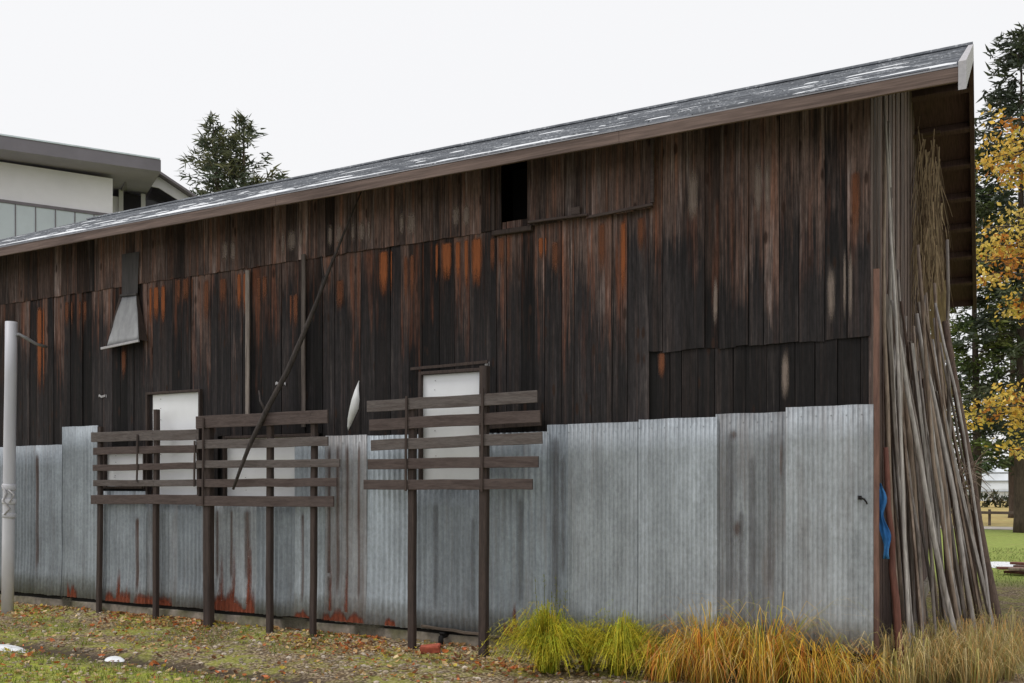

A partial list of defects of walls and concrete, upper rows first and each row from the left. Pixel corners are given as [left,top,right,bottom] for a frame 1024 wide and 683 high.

corrosion [105,579,172,606]
corrosion [215,559,254,613]
corrosion [323,582,363,623]